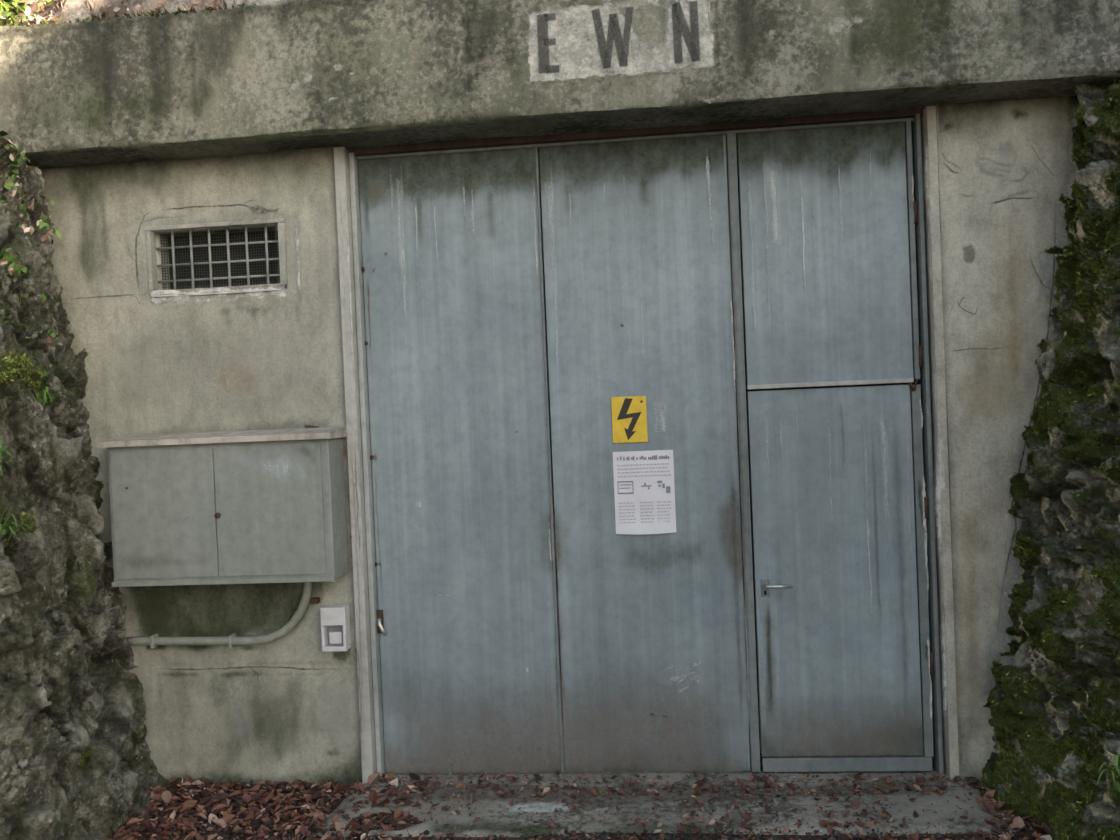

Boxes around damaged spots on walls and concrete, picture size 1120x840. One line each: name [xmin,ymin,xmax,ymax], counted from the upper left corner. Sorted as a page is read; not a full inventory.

crack [178,667,306,676]
damp [292,762,362,786]